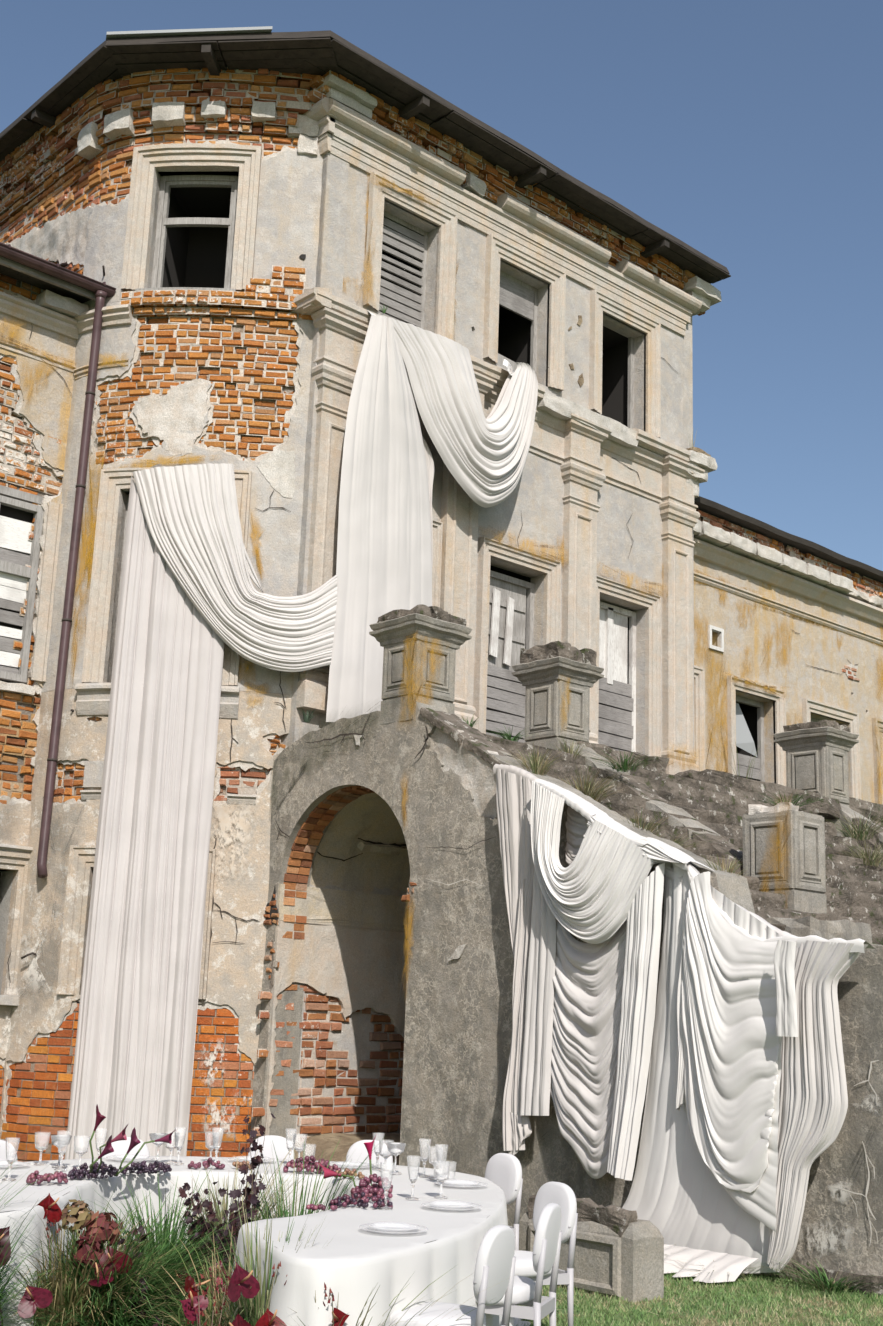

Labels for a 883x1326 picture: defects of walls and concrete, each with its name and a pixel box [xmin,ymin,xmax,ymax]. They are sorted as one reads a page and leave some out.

flaking render [0,274,45,301]
flaking render [0,356,62,616]
flaking render [94,254,313,498]
flaking render [0,67,695,290]
flaking render [696,509,883,598]
flaking render [0,635,41,804]
crack [415,726,429,758]
flaking render [250,785,404,1138]